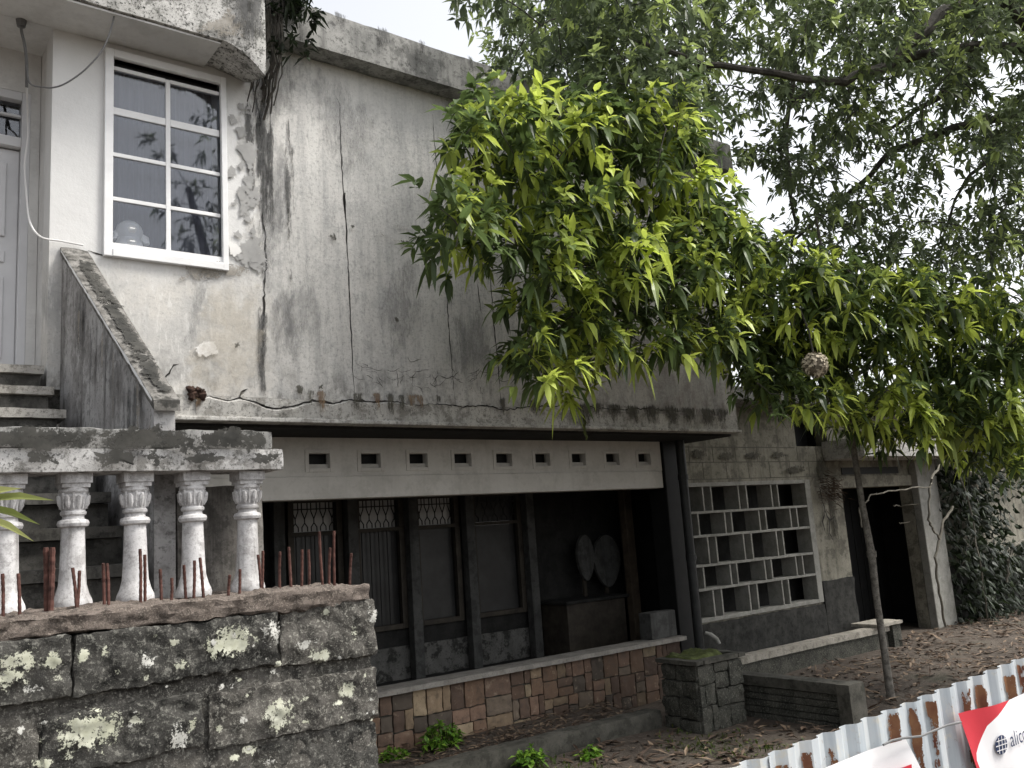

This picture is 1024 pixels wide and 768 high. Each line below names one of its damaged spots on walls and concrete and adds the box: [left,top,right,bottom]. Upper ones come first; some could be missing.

water stain [245,83,295,232]
peeling [227,103,268,273]
crack [210,99,683,412]
water stain [0,259,282,471]
peeling [194,341,218,357]
corrosion [308,390,326,411]
corrosion [353,393,423,413]
water stain [578,402,728,440]
corrosion [961,685,989,712]
corrosion [1004,665,1024,700]
corrosion [887,701,941,768]